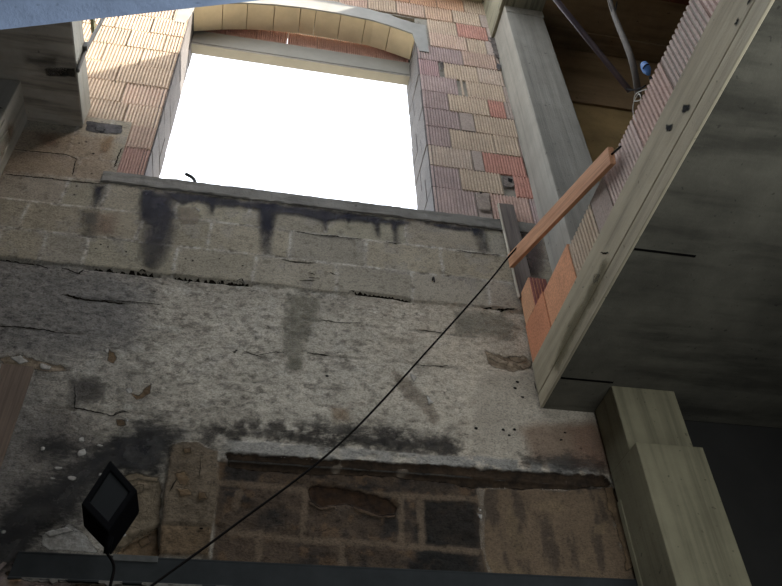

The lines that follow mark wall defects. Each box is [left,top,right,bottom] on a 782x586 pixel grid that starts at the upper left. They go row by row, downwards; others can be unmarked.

crack [8,149,100,184]
damp [142,190,409,264]
damp [425,222,487,250]
crack [0,260,154,278]
crack [62,294,160,305]
crack [175,277,249,287]
crack [0,326,70,334]
spalling [485,351,532,398]
damp [313,422,403,441]
damp [110,431,173,473]
spalling [226,452,633,571]
damp [0,495,56,566]